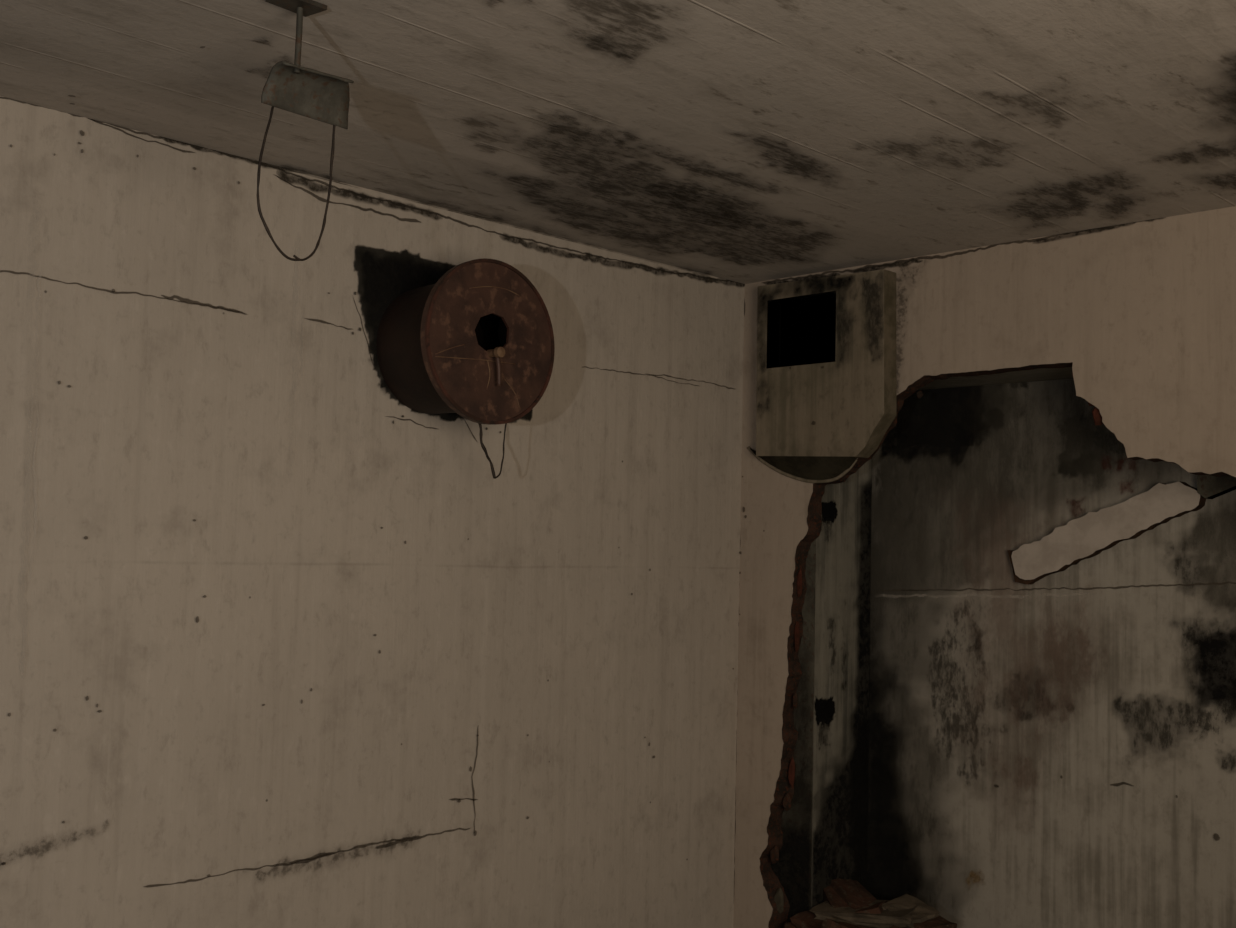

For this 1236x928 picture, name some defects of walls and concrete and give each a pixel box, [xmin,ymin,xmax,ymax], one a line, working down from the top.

water stain [572,0,672,60]
crack [0,97,1160,315]
water stain [418,115,836,265]
water stain [1008,173,1146,227]
water stain [1156,144,1236,163]
crack [306,292,351,330]
water stain [758,276,882,362]
water stain [1173,503,1236,607]
water stain [771,349,1160,923]
spalling [760,362,1234,928]
water stain [1115,622,1236,749]
crack [146,725,479,887]